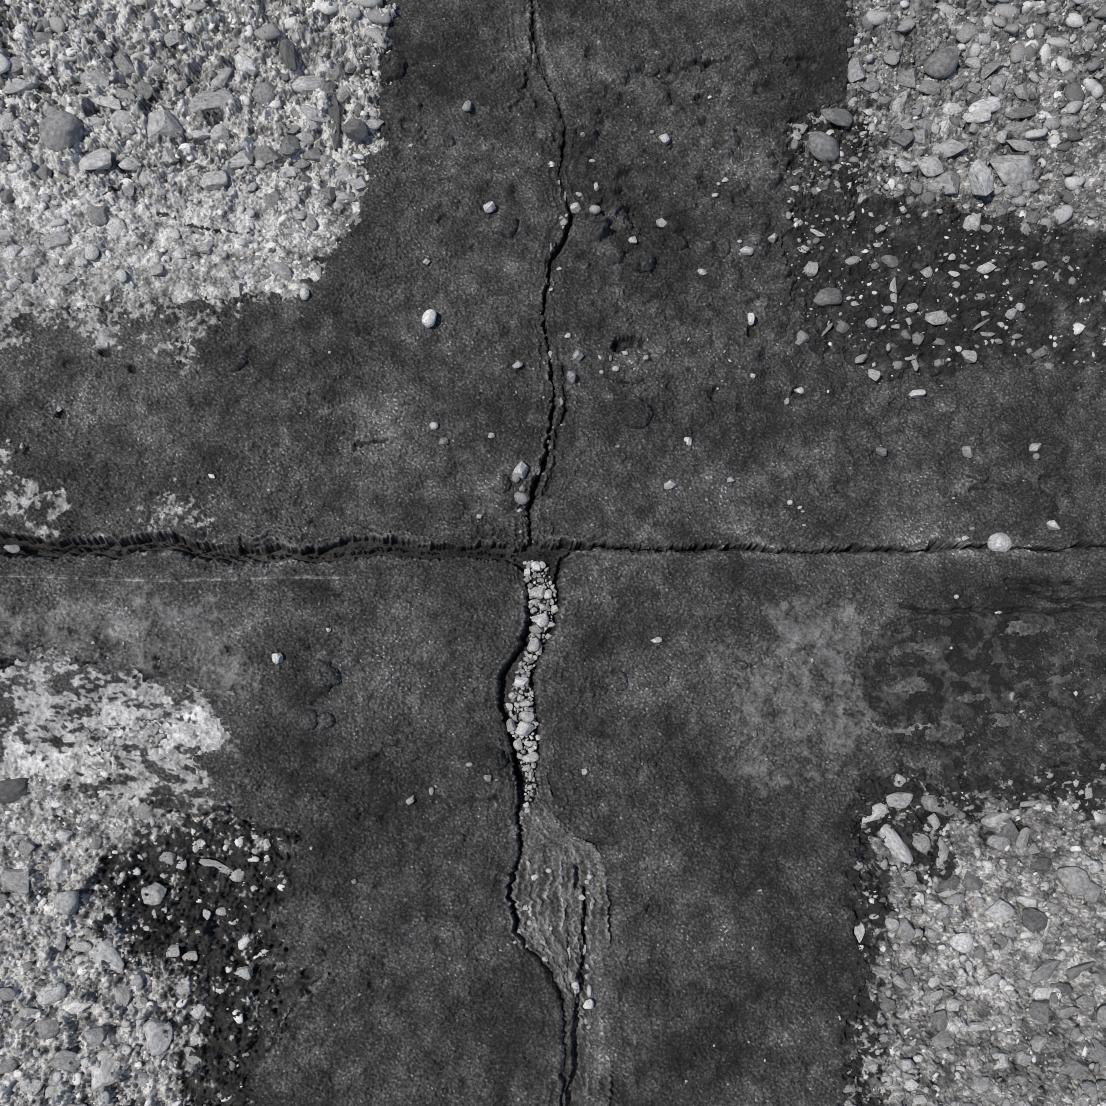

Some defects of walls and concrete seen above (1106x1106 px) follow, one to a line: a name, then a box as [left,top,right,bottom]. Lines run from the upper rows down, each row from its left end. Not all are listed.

crack [510,29,540,112]
crack [658,55,731,85]
crack [99,160,157,203]
spalling [0,0,397,318]
crack [156,211,261,236]
spalling [781,0,1106,389]
crack [351,437,389,454]
crack [543,365,570,497]
crack [0,573,355,582]
crack [899,578,1106,615]
spalling [833,609,1106,1106]
spalling [0,766,329,1106]